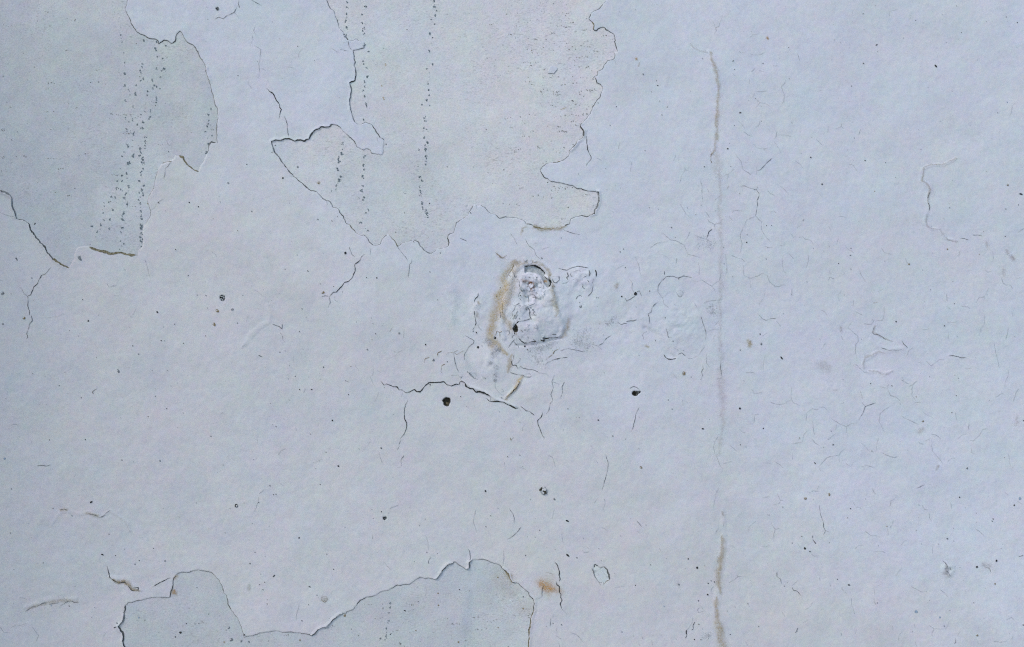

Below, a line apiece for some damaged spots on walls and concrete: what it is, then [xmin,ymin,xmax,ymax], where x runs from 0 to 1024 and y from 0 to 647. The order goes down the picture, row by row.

peeling [0,0,218,269]
peeling [269,0,617,254]
crack [351,122,980,552]
peeling [115,558,538,647]